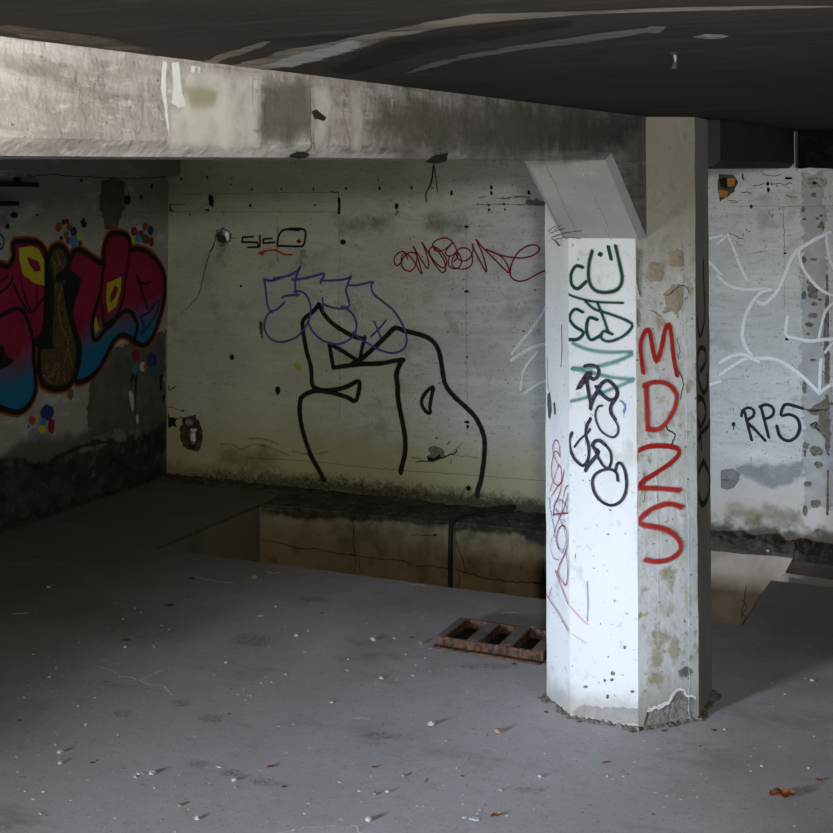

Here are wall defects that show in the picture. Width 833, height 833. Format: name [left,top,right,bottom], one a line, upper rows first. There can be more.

spalling [636,248,684,297]
spalling [663,284,684,318]
spalling [168,413,203,451]
spalling [412,437,463,464]
water stain [0,423,166,531]
water stain [196,472,546,513]
spalling [573,691,697,726]